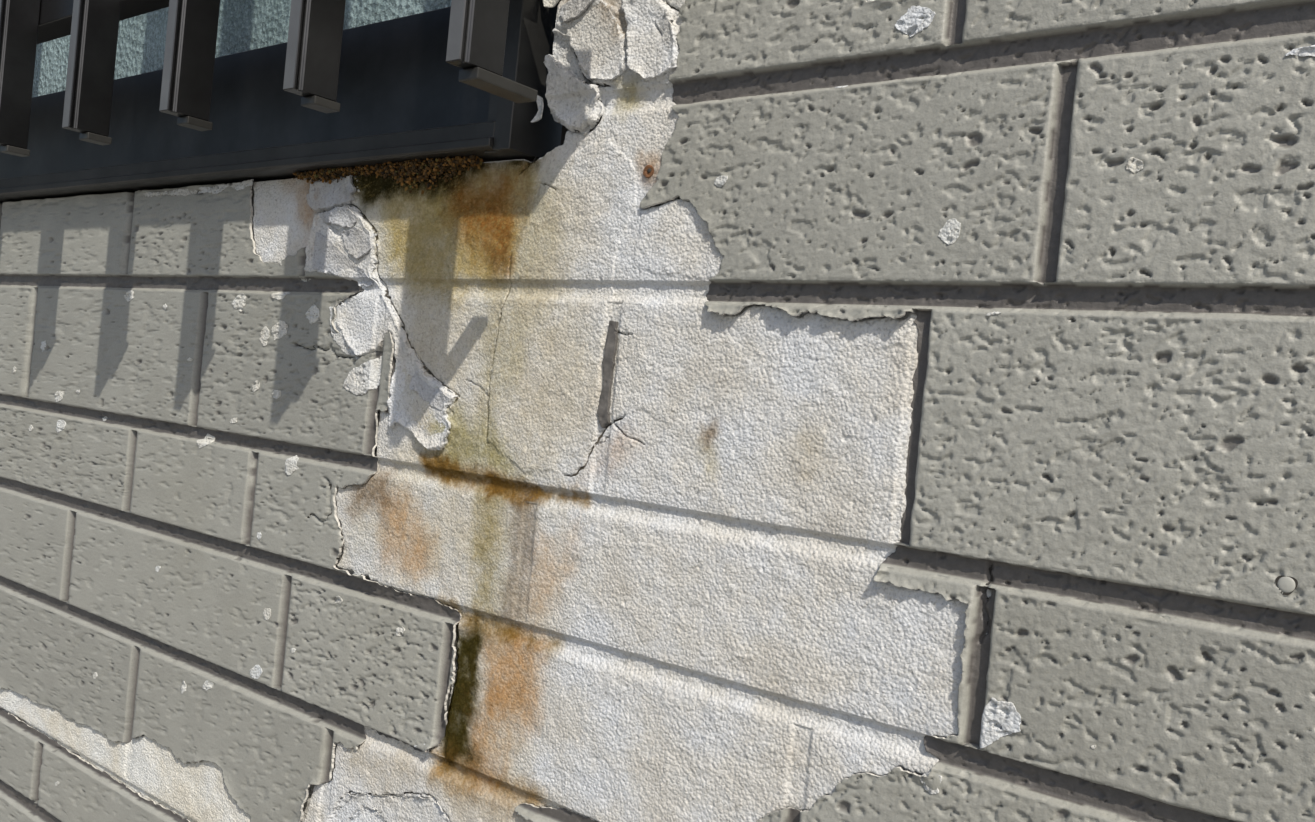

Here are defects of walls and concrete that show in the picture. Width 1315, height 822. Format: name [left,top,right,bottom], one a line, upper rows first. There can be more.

peeling [1285,45,1315,57]
damp [352,163,487,204]
peeling [1126,157,1143,173]
peeling [144,0,968,822]
crack [566,417,642,477]
corrosion [424,458,463,480]
corrosion [486,474,543,501]
peeling [980,698,1022,748]
peeling [0,688,250,822]